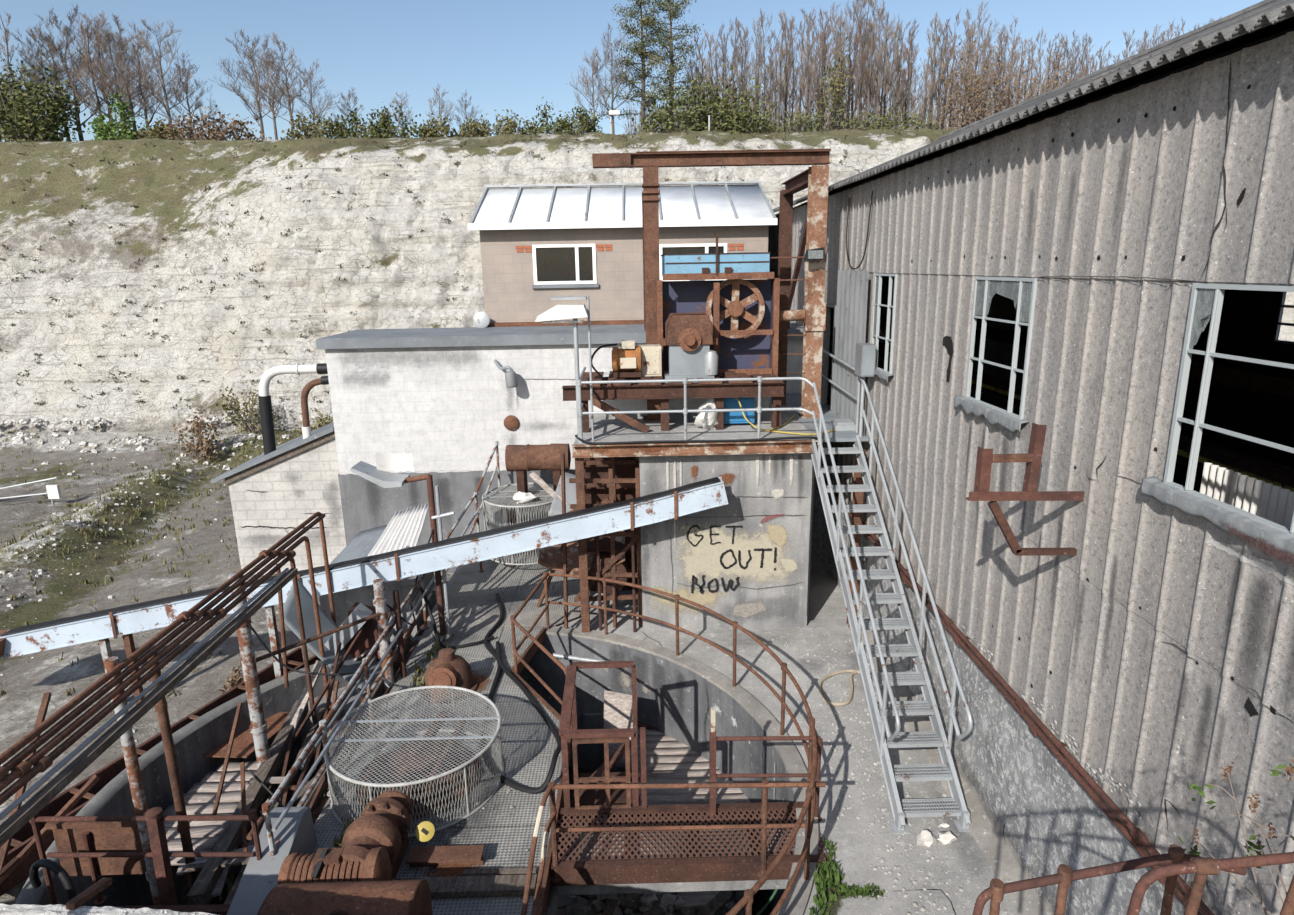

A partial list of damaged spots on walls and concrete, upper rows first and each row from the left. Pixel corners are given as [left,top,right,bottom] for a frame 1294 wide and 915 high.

crack [1041,60,1231,281]
peeling [679,525,797,584]
water stain [1220,522,1294,566]
crack [1160,641,1195,661]